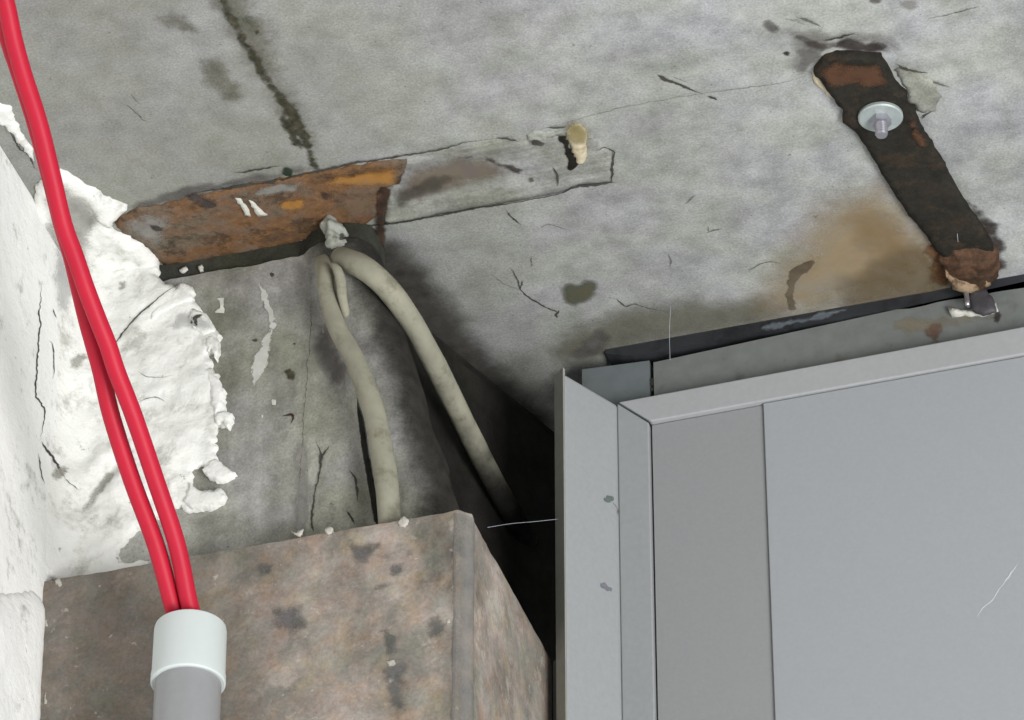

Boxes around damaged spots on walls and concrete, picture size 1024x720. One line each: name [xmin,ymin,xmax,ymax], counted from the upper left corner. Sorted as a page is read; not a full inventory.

spalling [894,64,948,118]
leakage [279,113,306,147]
crack [197,76,805,193]
spalling [527,130,578,170]
corrosion [328,171,395,249]
crack [497,258,559,318]
leakage [563,281,596,304]
leakage [750,261,814,310]
corrosion [779,206,948,302]
corrosion [974,206,1005,270]
crack [35,288,77,489]
crack [296,286,329,532]